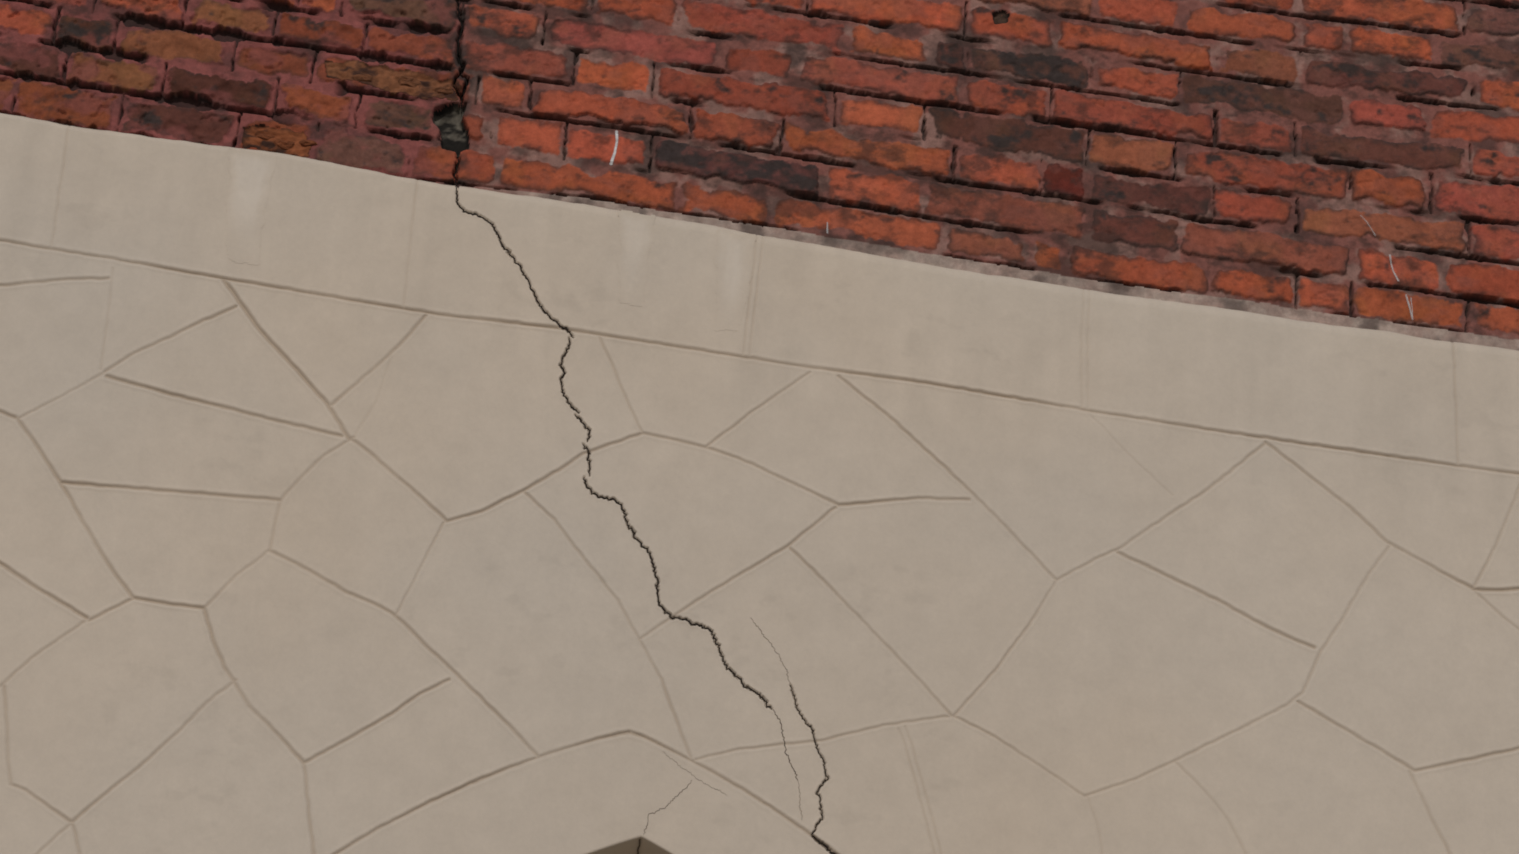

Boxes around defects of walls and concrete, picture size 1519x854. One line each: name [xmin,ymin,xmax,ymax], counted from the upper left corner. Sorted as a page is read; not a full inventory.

crack [453,0,468,110]
crack [454,150,835,854]